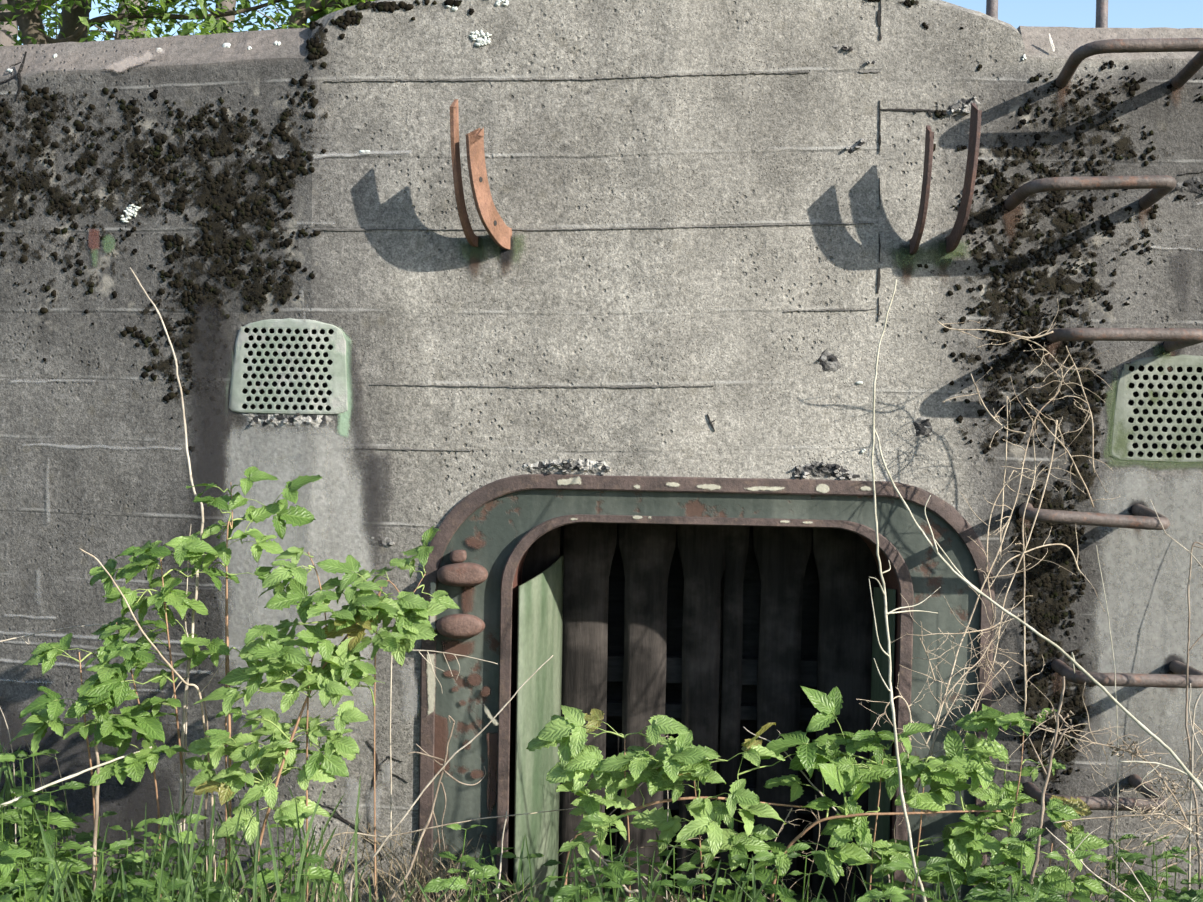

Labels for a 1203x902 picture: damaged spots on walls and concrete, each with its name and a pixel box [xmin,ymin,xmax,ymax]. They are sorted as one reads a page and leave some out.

water stain [221,426,375,723]
water stain [0,631,99,639]
water stain [1093,459,1203,754]
water stain [402,669,420,715]
peeling [427,654,436,715]
rust [441,640,491,706]
water stain [348,765,390,817]
rust [434,714,450,775]
rust [471,732,498,815]